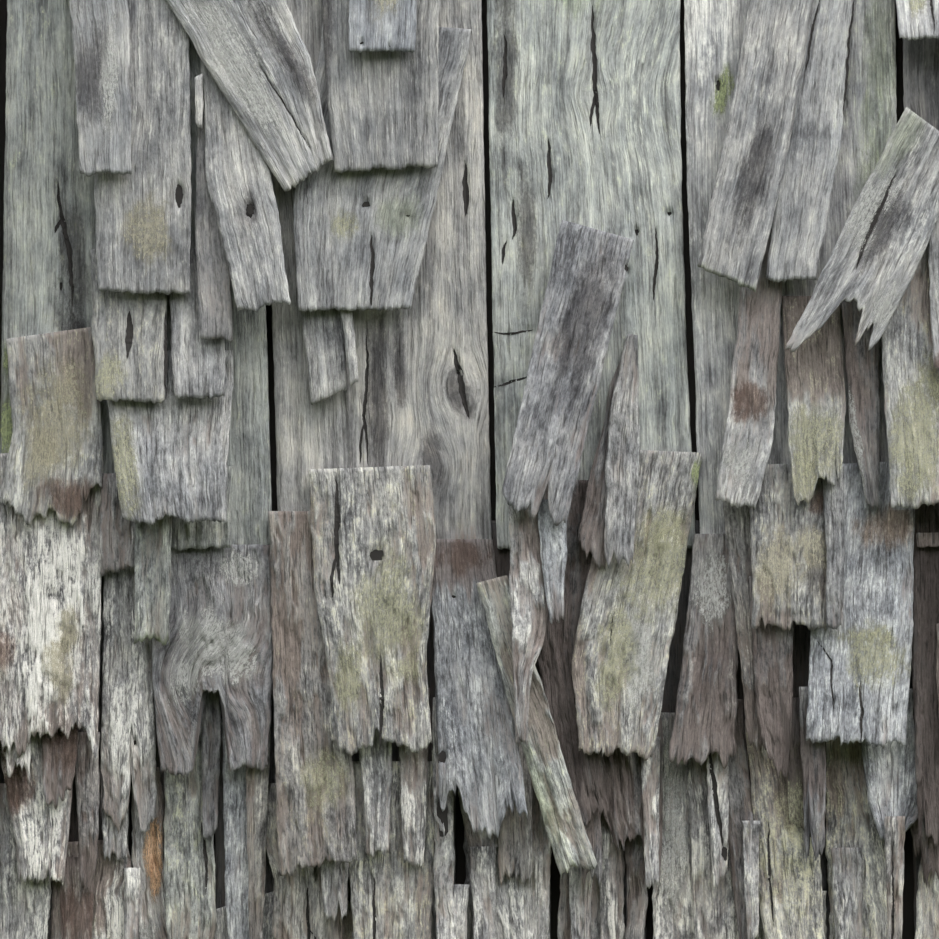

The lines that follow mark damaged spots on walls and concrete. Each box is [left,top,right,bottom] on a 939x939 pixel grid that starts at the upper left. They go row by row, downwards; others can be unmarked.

crack [590,6,600,134]
crack [368,236,376,306]
crack [453,350,470,419]
crack [494,376,527,387]
water stain [618,604,656,708]